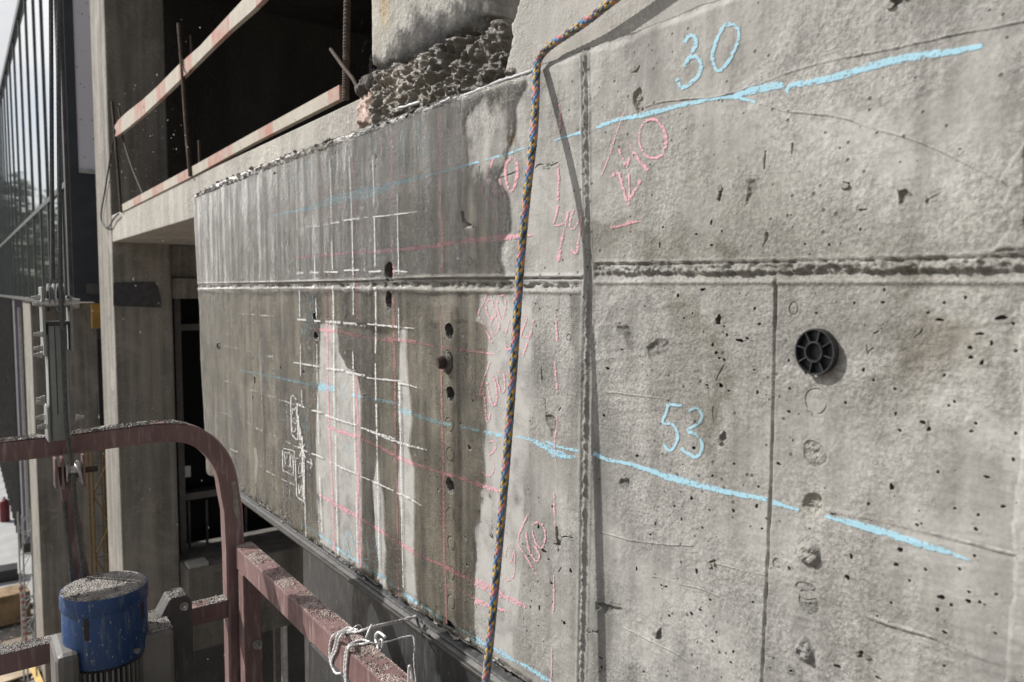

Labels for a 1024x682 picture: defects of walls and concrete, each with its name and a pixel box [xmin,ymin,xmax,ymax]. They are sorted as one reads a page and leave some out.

spalling [194,19,516,198]
crack [761,140,796,172]
damp [193,131,360,315]
damp [488,300,531,357]
damp [399,355,409,394]
damp [488,352,528,416]
damp [302,328,384,585]
damp [483,413,521,515]
damp [398,452,414,558]
damp [395,574,434,620]
damp [477,536,519,615]